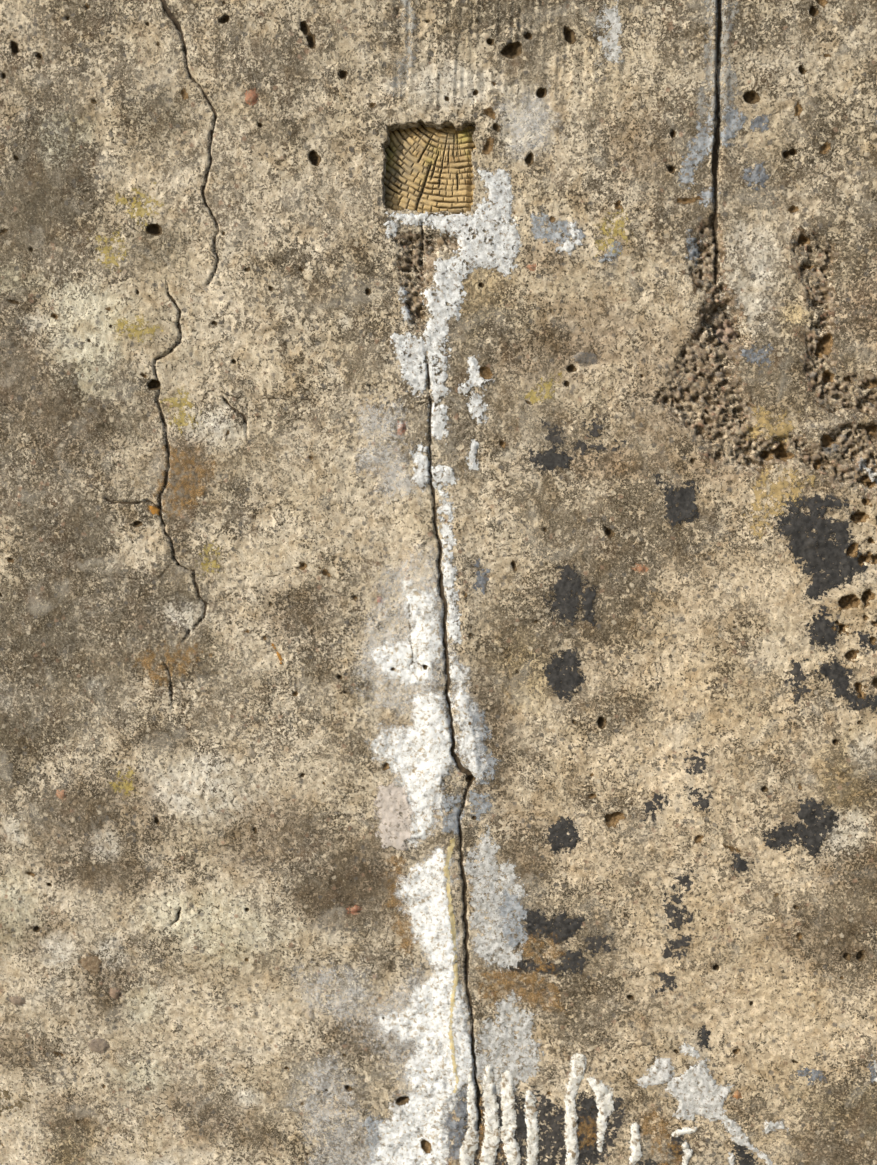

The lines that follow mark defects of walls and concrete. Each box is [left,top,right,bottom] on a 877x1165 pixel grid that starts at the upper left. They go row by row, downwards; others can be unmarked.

crack [93,0,344,634]
crack [712,0,723,285]
crack [408,364,481,1131]